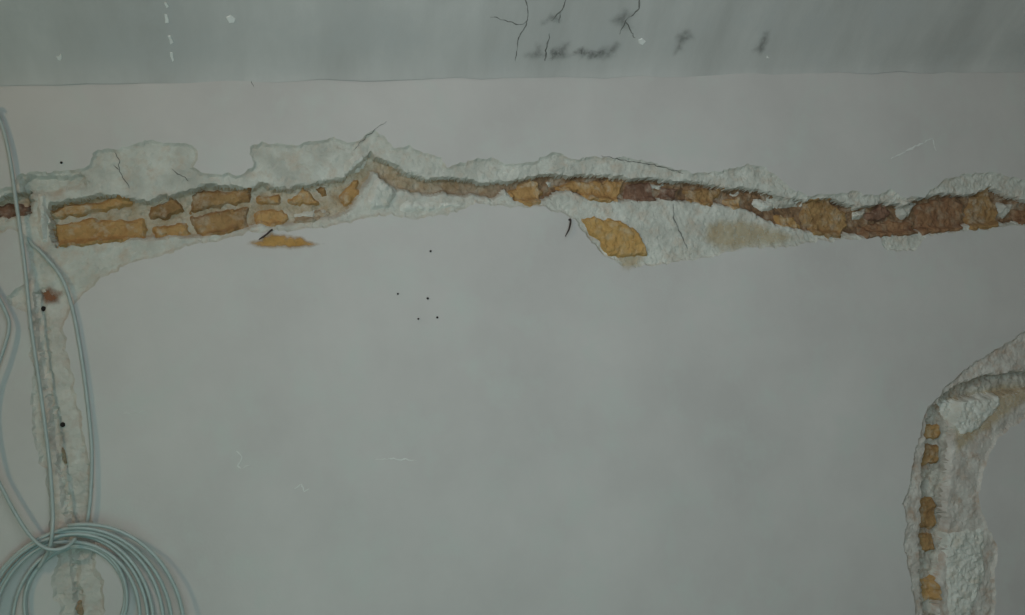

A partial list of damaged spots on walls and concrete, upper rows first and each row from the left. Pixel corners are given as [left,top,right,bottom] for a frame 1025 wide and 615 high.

crack [496,0,566,61]
crack [620,0,640,38]
flaking render [0,130,1025,615]